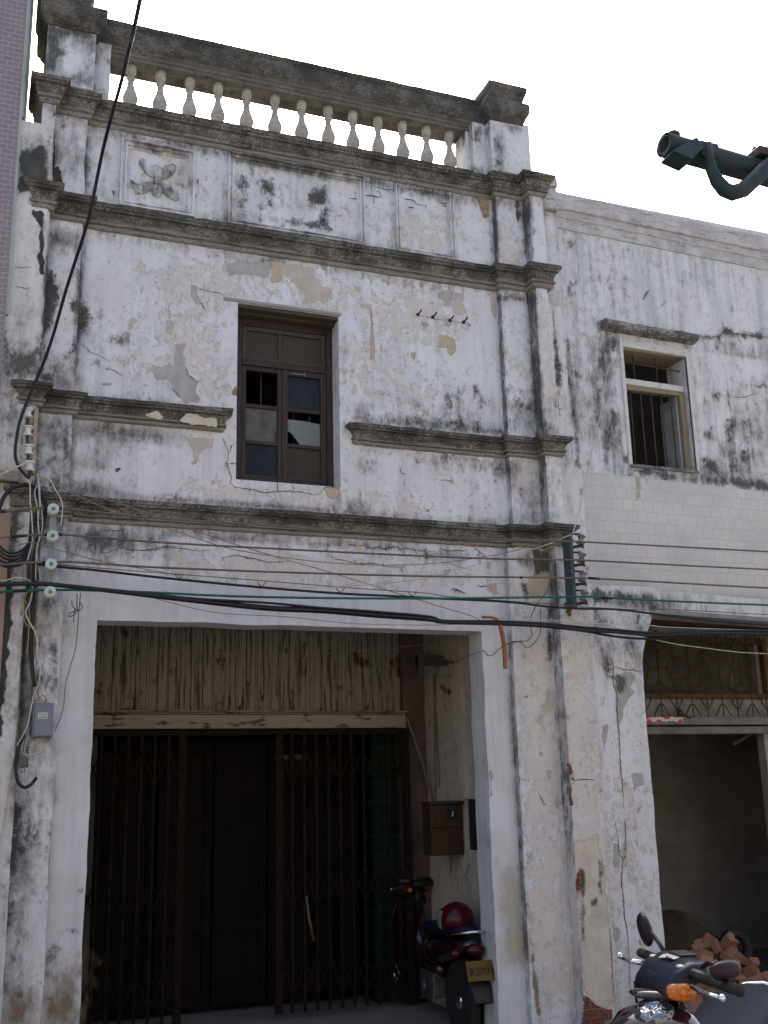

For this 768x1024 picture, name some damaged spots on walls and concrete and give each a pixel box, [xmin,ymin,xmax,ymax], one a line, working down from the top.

leakage [17,145,63,193]
mould [289,185,333,231]
leakage [3,210,59,377]
peeling [227,261,332,304]
peeling [421,290,471,356]
peeling [151,320,217,465]
crack [222,438,339,495]
leakage [703,419,768,490]
peeling [602,671,635,752]
mould [9,802,25,888]
crack [610,659,640,1004]
peeling [574,834,620,1024]